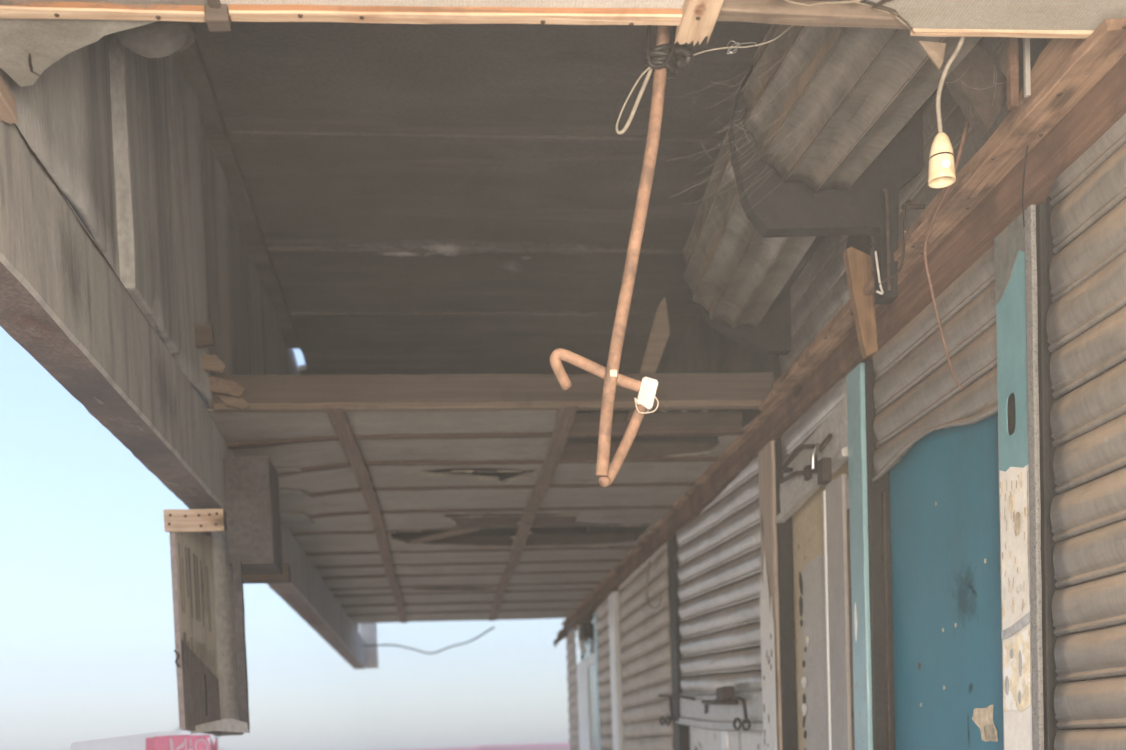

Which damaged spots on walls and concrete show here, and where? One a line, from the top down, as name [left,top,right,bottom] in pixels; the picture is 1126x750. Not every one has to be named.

spalling [785,0,911,30]
peeling [919,41,946,69]
peeling [1000,471,1030,619]